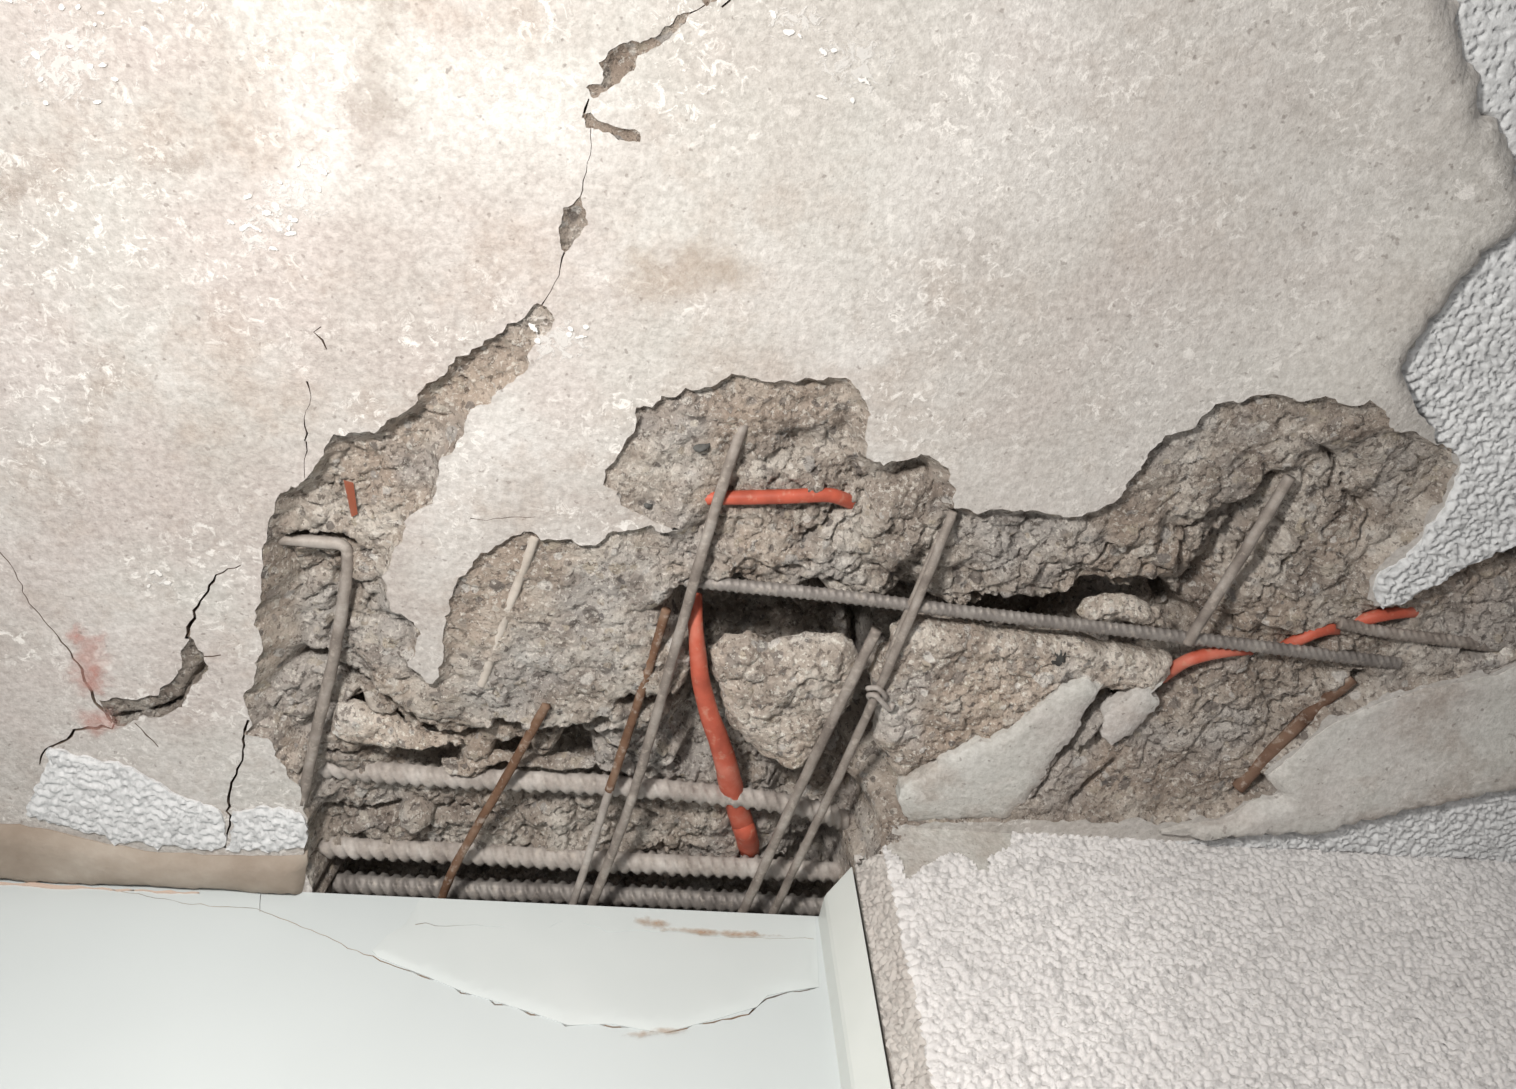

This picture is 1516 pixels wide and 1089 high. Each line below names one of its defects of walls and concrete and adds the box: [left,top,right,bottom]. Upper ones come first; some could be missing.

peeling [227,202,298,251]
crack [541,0,731,307]
peeling [769,10,802,38]
peeling [1455,0,1516,176]
crack [0,552,158,764]
crack [185,565,241,657]
spalling [26,230,1516,916]
crack [224,720,250,847]